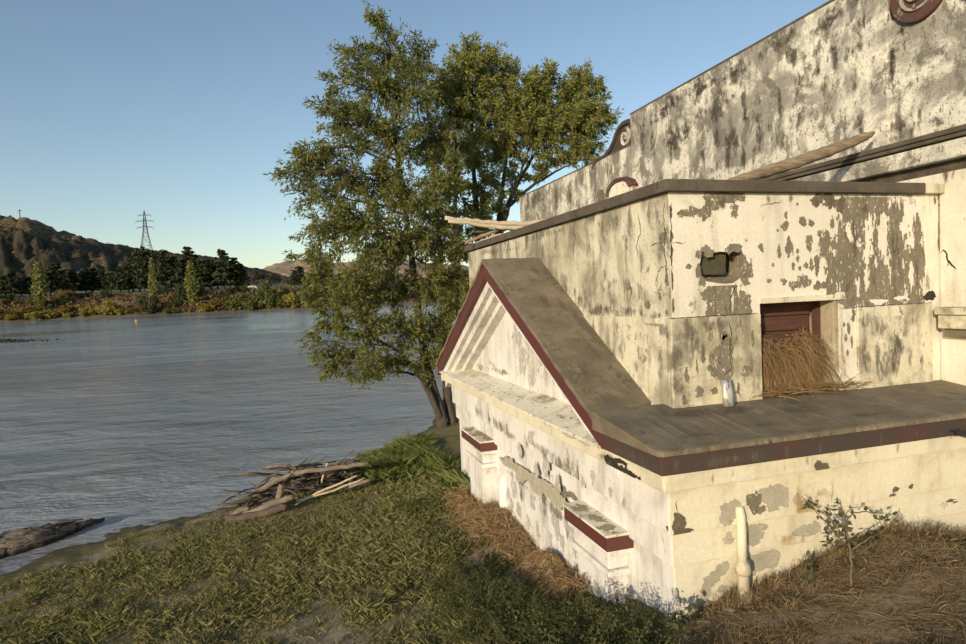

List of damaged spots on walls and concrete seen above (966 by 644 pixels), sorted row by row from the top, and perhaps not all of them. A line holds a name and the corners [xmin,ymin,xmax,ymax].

leakage [760,30,825,92]
leakage [816,10,843,31]
leakage [830,13,865,69]
leakage [640,94,690,163]
leakage [693,64,785,167]
peeling [669,193,746,221]
peeling [685,243,754,347]
peeling [767,193,936,357]
leakage [863,317,923,376]
spalling [604,454,641,480]
spalling [666,512,694,535]
peeling [719,484,807,576]